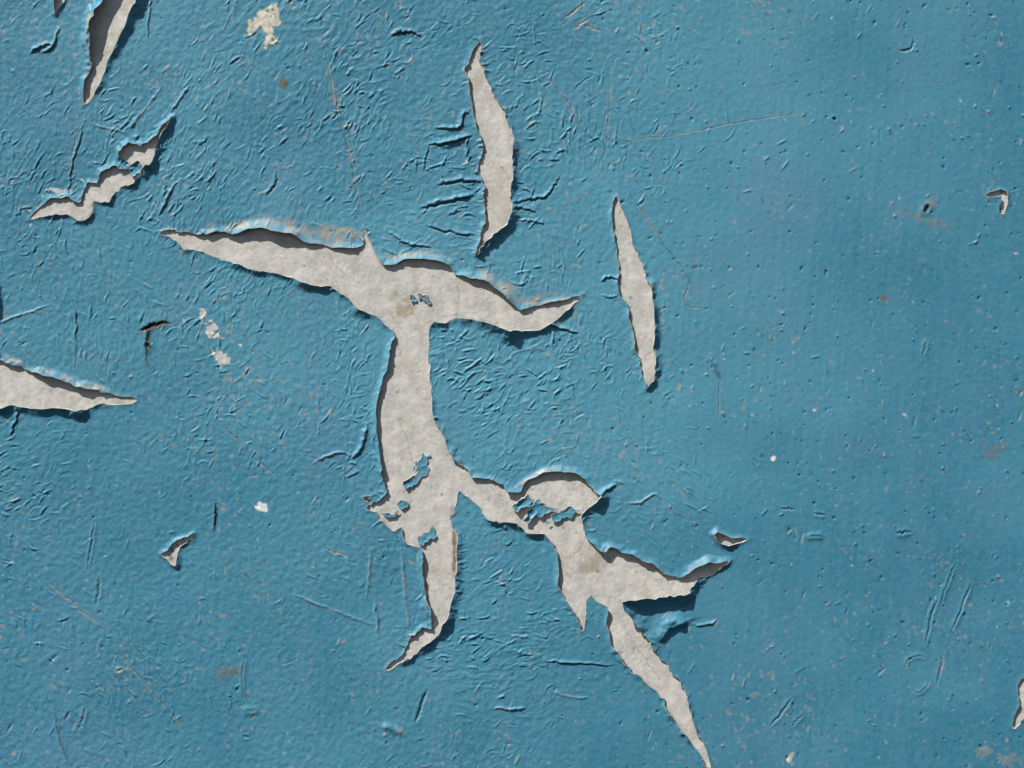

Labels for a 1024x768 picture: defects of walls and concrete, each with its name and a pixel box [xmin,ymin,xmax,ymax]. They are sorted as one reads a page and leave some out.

peeling [77,0,149,110]
peeling [25,111,180,229]
crack [384,109,478,251]
peeling [981,185,1013,219]
peeling [0,350,143,425]
peeling [156,32,755,768]
peeling [1009,675,1024,732]